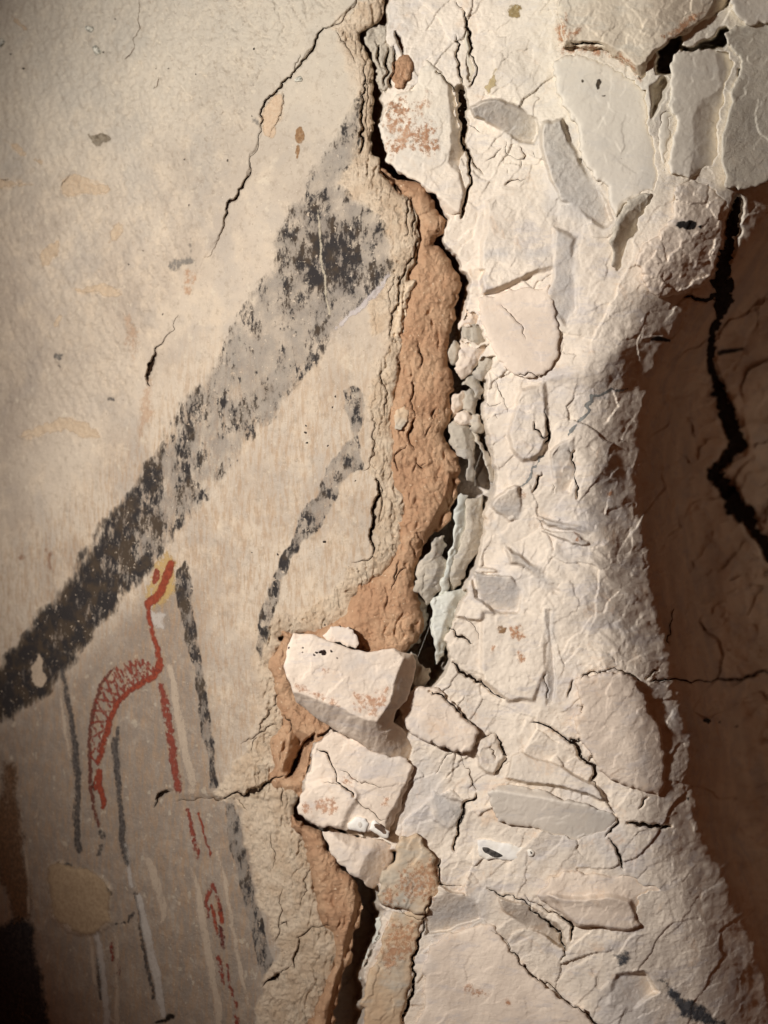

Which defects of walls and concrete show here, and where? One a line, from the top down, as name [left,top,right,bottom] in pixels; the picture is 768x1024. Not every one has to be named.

flaking render [262,95,283,138]
crack [209,1,404,257]
spalling [364,25,397,93]
spalling [676,220,702,230]
flaking render [391,280,416,337]
spalling [447,285,560,483]
crack [684,197,768,562]
spalling [407,493,484,691]
crack [154,695,381,821]
crack [393,691,507,1018]
crack [487,888,574,958]
crack [532,722,670,868]